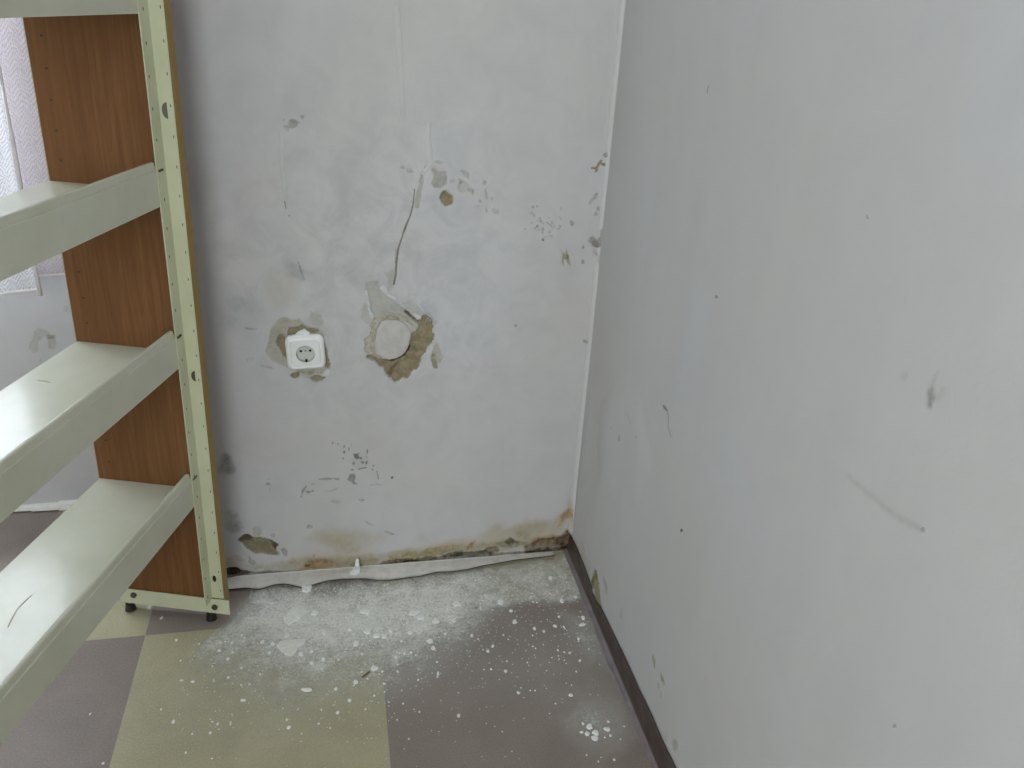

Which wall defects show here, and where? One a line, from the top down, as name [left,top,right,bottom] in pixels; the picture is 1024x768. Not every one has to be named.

peeling [400,160,470,208]
crack [393,189,415,285]
spalling [245,310,332,383]
spalling [360,285,444,383]
spalling [226,526,288,574]
damp [253,521,484,572]